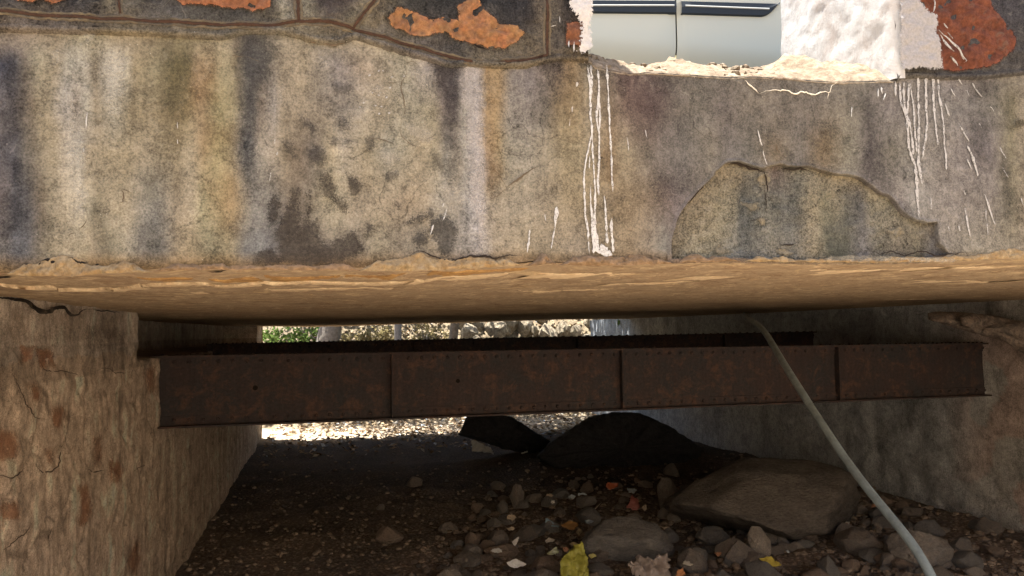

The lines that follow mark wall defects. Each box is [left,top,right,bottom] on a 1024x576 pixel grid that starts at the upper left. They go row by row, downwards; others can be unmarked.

damp [253,116,371,266]
spalling [0,158,1024,294]
damp [588,65,614,257]
crack [745,80,837,96]
damp [899,78,947,217]
crack [0,276,115,316]